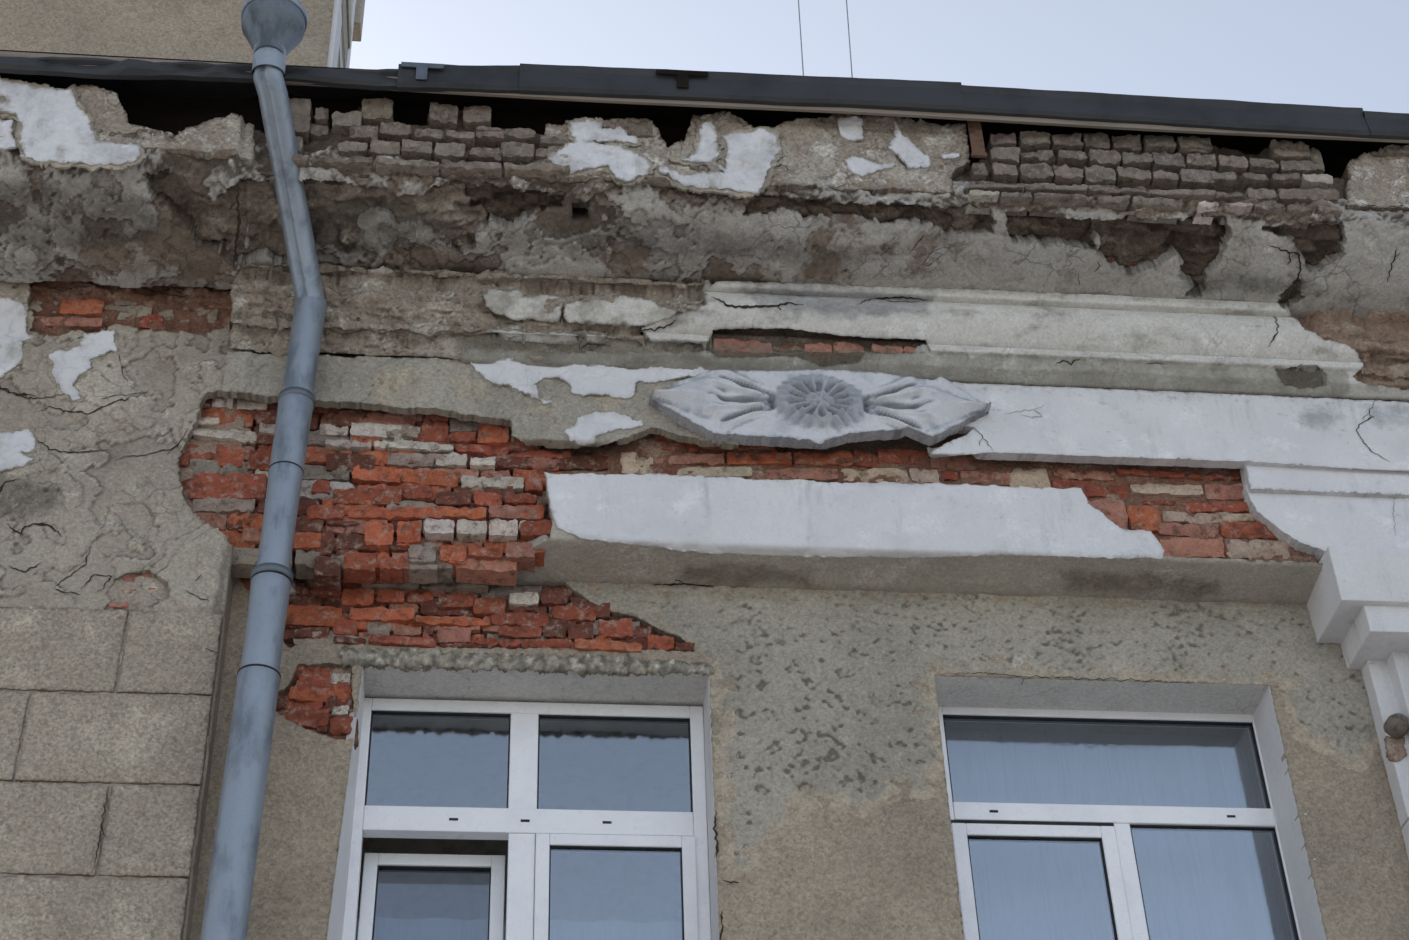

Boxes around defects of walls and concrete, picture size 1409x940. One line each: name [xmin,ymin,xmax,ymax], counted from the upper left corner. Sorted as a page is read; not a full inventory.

peeling [0,75,274,256]
flaking render [289,98,784,199]
flaking render [837,116,1345,230]
flaking render [0,281,232,409]
crack [714,297,803,310]
crack [1268,245,1302,347]
spalling [1277,280,1300,303]
crack [0,355,188,460]
crack [1356,400,1384,459]
crack [0,479,112,595]
flaking render [179,397,278,590]
flaking render [276,328,1407,881]